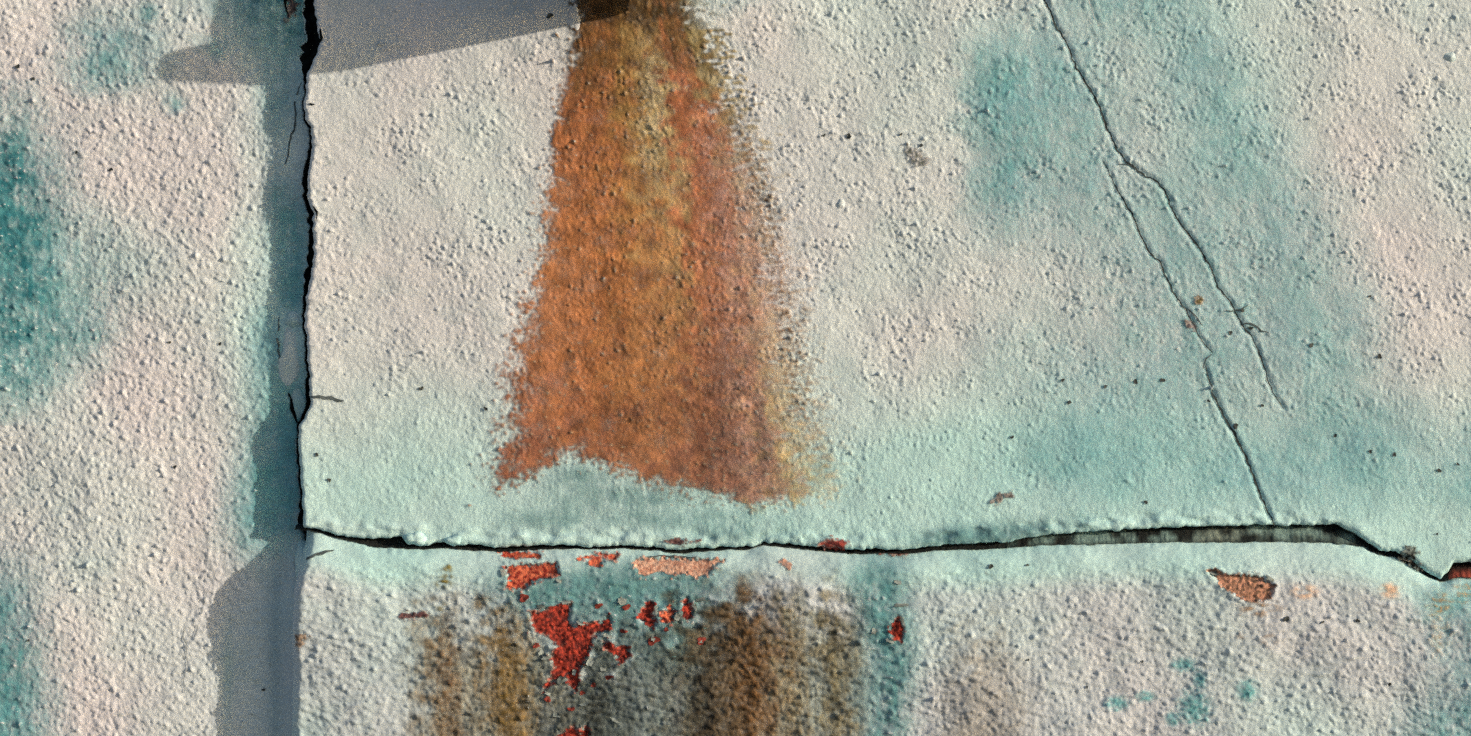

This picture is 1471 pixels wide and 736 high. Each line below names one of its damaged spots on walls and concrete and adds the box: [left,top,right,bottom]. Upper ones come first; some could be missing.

rust [491,0,833,509]
crack [276,0,1471,582]
rust [415,601,546,736]
peeling [497,551,705,736]
peeling [577,537,725,580]
rust [678,577,863,736]
spalling [1206,568,1277,602]
spalling [1447,564,1471,580]